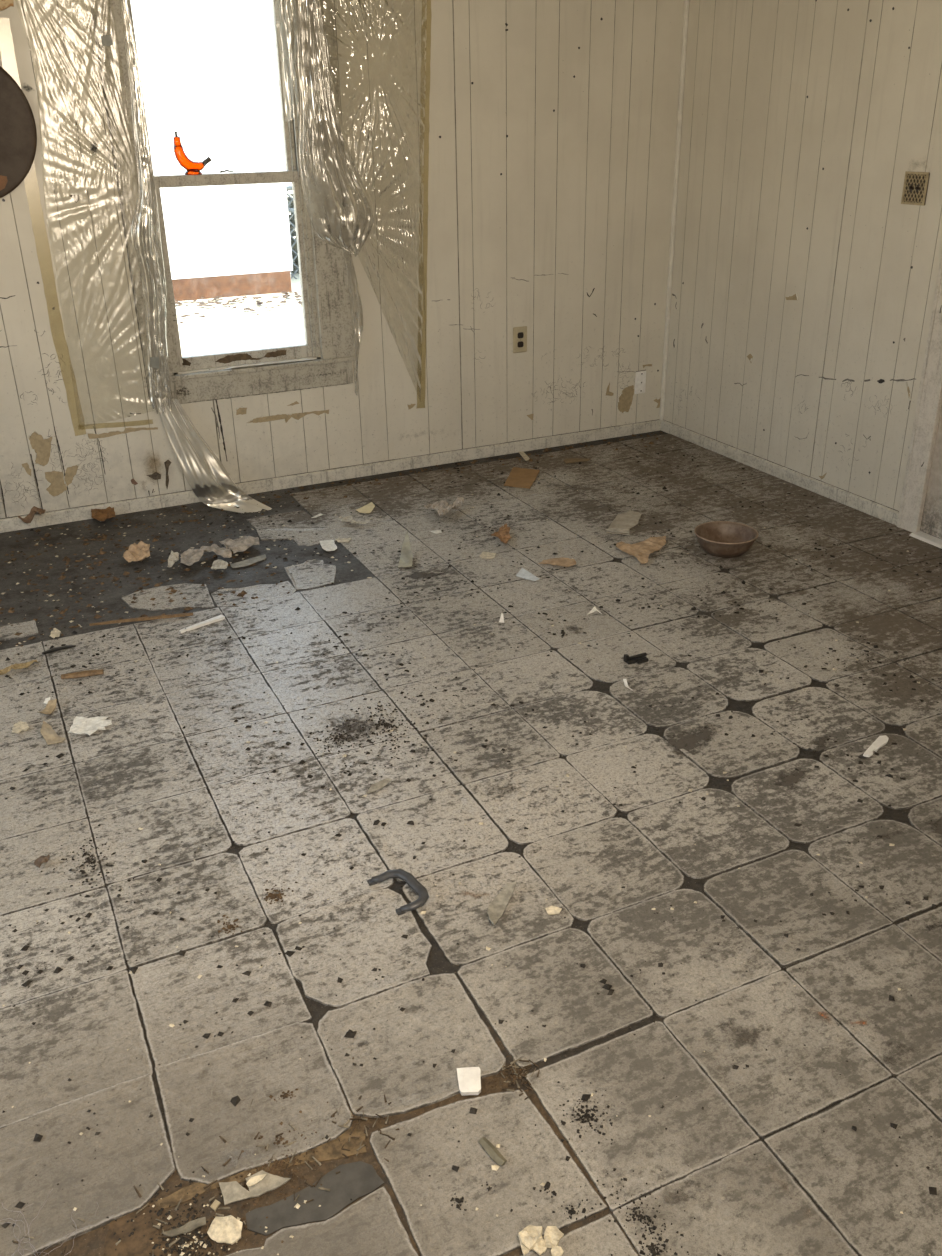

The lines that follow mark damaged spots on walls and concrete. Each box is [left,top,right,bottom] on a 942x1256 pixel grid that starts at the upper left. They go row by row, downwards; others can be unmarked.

peeling [236,401,329,423]
peeling [605,383,634,414]
peeling [22,431,79,497]
peeling [319,538,351,551]
peeling [207,1215,243,1245]